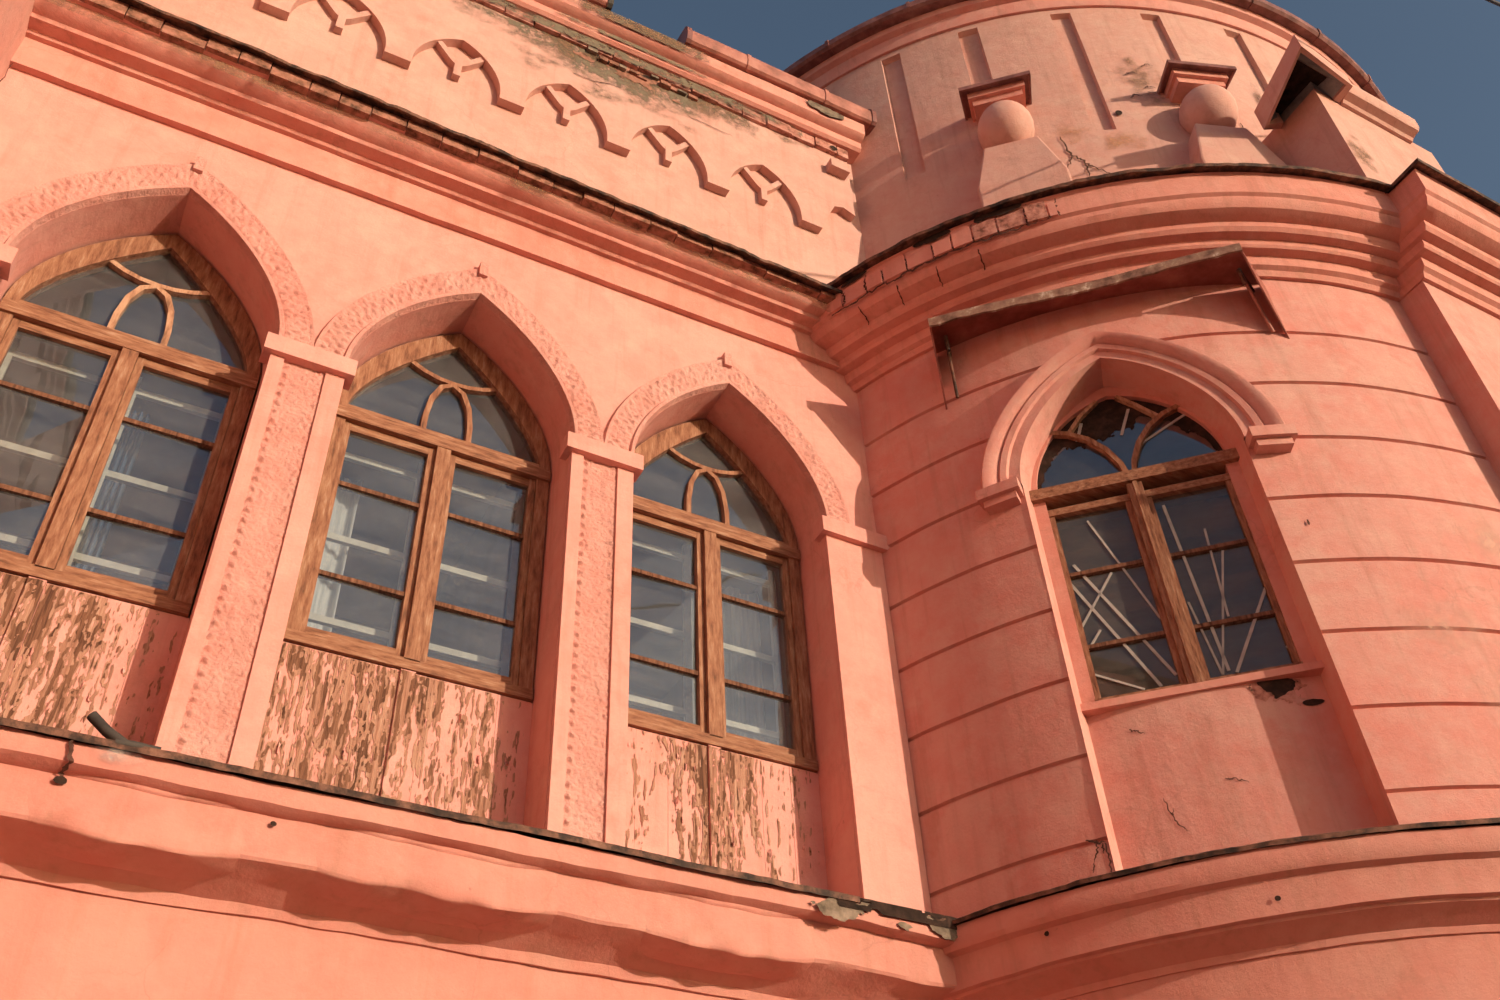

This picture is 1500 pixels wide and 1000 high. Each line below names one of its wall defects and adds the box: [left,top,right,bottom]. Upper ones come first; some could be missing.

water stain [465,0,803,142]
peeling [0,572,177,743]
peeling [253,642,524,822]
flaking render [1243,678,1325,706]
peeling [625,728,819,881]
spalling [811,897,962,940]
crack [1086,840,1112,873]
crack [1163,798,1187,831]